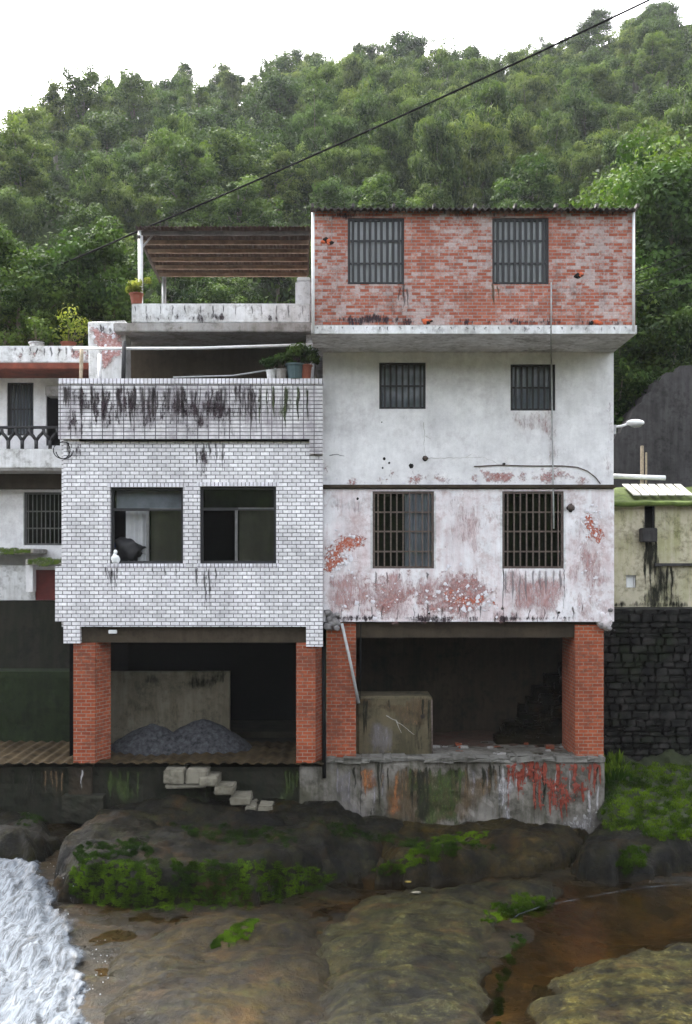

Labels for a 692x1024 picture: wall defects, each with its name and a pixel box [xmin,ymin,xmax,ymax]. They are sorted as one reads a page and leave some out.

peeling [89,325,122,368]
water stain [63,385,308,475]
peeling [371,443,612,485]
water stain [326,572,485,623]
peeling [323,529,504,622]
water stain [494,571,583,622]
peeling [558,503,605,620]
water stain [614,542,686,607]
water stain [371,763,571,822]
peeling [505,761,601,830]